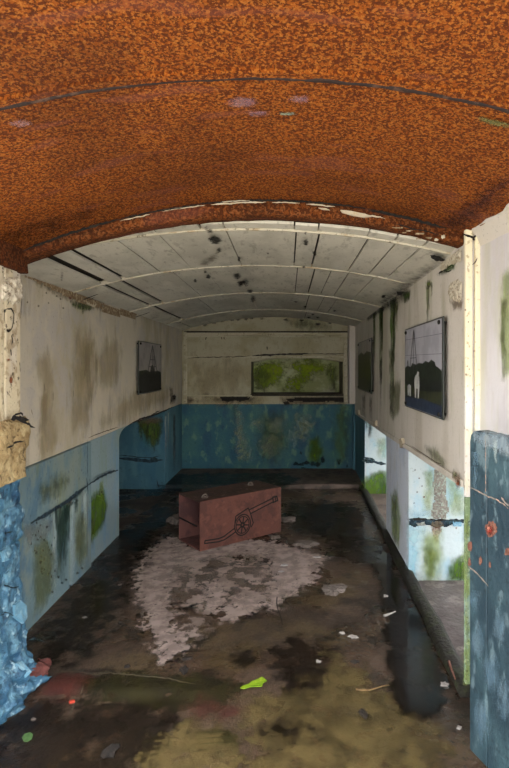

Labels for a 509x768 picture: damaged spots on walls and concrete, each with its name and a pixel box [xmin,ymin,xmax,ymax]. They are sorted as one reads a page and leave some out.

peeling [162,200,296,212]
peeling [308,204,385,219]
water stain [367,269,433,385]
peeling [431,470,449,519]
water stain [26,411,325,669]
water stain [268,633,336,703]
water stain [259,718,315,744]